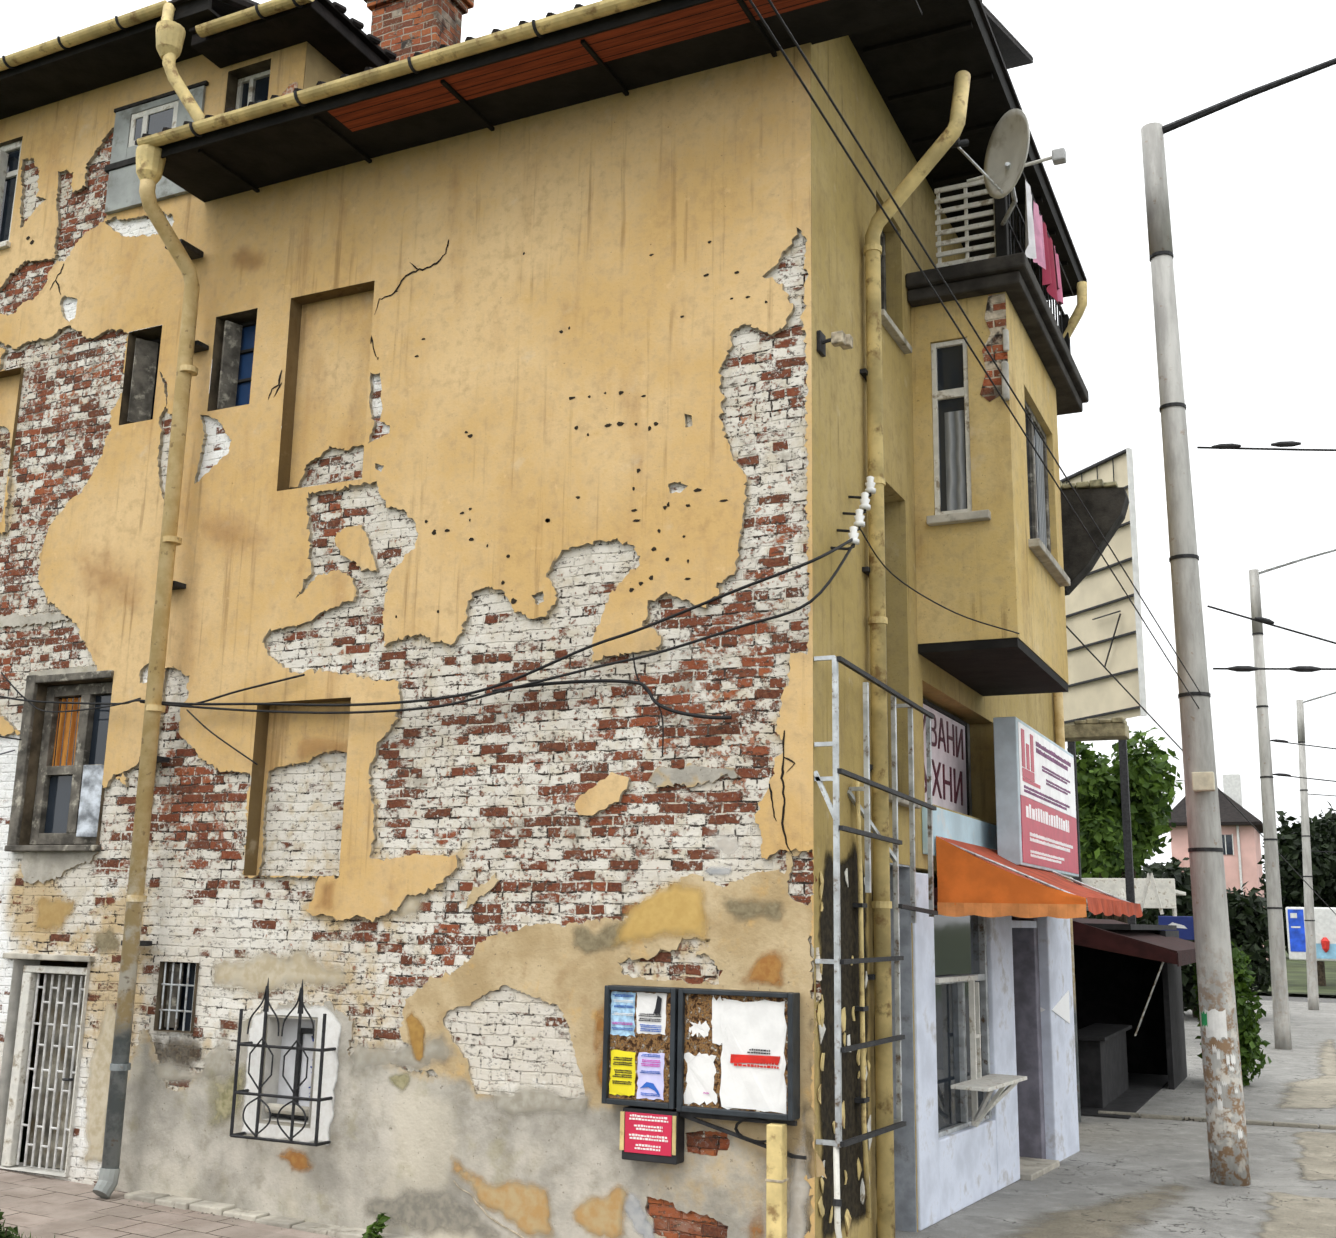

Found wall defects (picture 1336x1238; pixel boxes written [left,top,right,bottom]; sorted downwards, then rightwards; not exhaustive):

spalling [0,127,174,316]
crack [370,240,449,357]
spalling [980,293,1010,402]
spalling [130,228,824,1099]
spalling [0,295,140,1186]
water stain [215,951,344,993]
water stain [153,1006,449,1145]
water stain [492,1088,587,1115]
peeling [808,936,871,1104]
water stain [367,1191,498,1237]
water stain [623,1194,654,1238]
spalling [645,1197,728,1238]